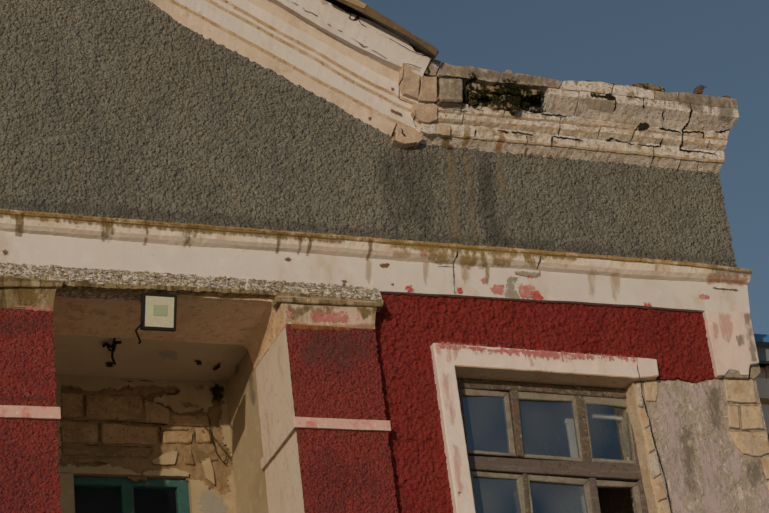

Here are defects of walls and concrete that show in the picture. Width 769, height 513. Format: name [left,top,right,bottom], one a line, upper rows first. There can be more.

crack [293,2,467,137]
crack [606,96,729,171]
damp [0,210,345,253]
damp [392,152,576,282]
crack [437,249,458,293]
peeling [481,271,544,300]
peeling [438,342,635,362]
peeling [59,385,233,495]
crack [636,357,672,513]